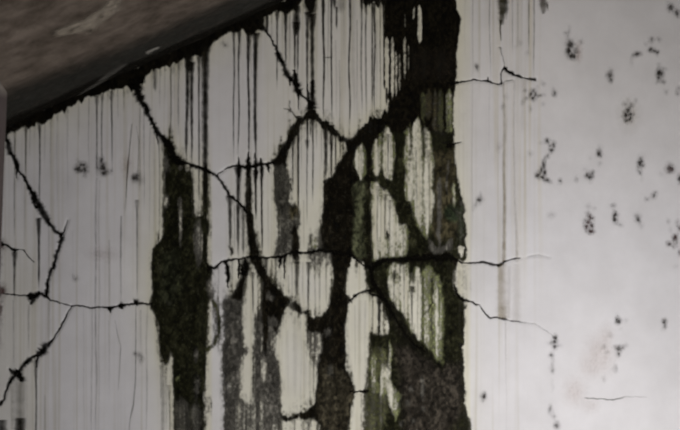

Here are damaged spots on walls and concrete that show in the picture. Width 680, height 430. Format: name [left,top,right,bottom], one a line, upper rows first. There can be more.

crack [261,26,317,118]
crack [446,67,536,85]
crack [129,77,274,214]
crack [0,134,153,406]
water stain [5,0,471,430]
crack [207,249,520,352]